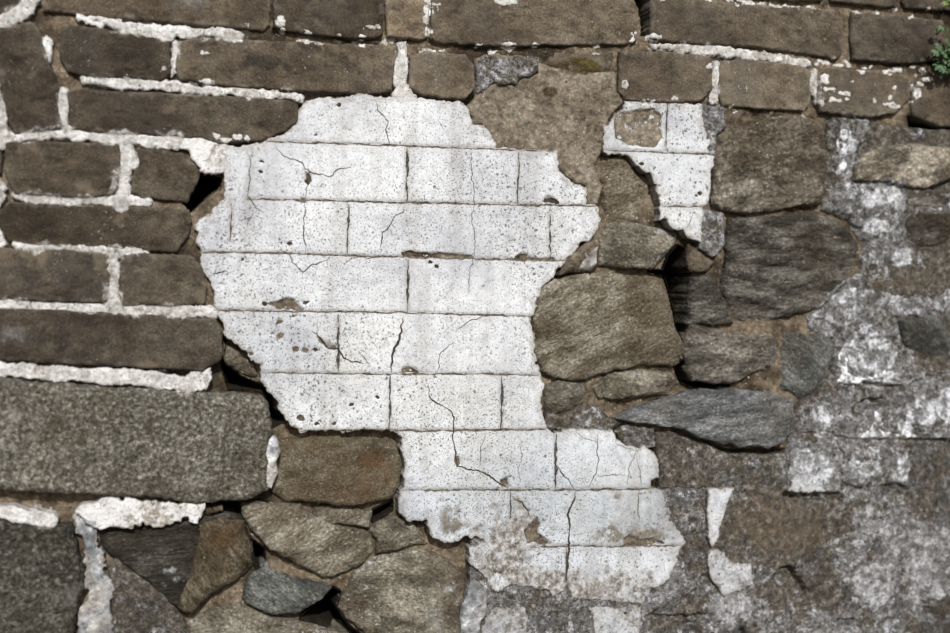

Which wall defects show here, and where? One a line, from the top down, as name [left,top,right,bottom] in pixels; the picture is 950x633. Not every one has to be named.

crack [275,144,405,277]
crack [467,151,475,292]
peeling [600,101,716,342]
crack [312,318,404,373]
peeling [183,93,686,633]
crack [428,316,531,519]
spalling [673,359,730,390]
crack [557,435,641,579]